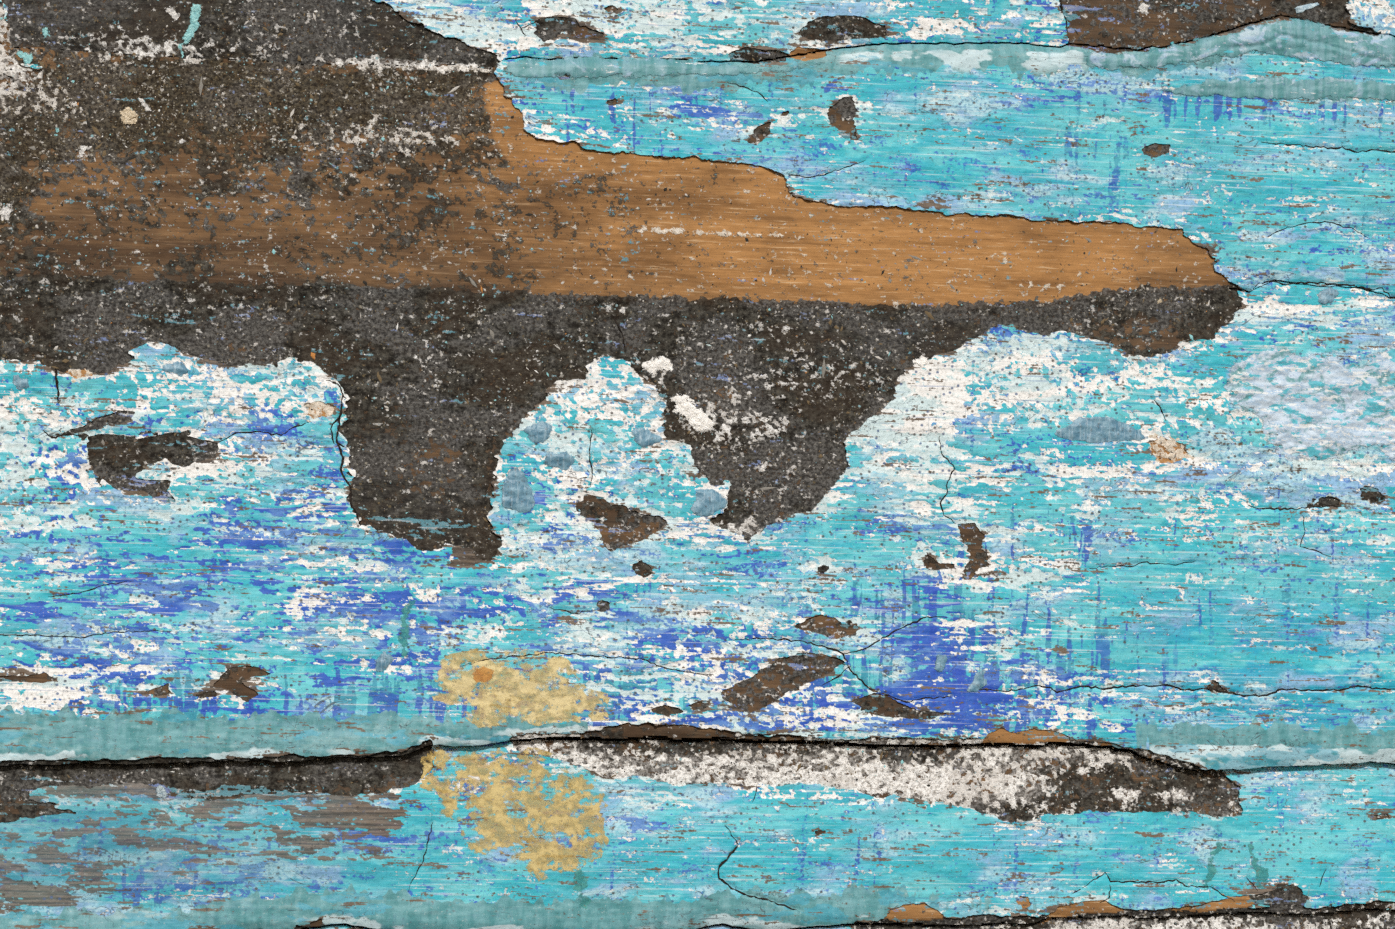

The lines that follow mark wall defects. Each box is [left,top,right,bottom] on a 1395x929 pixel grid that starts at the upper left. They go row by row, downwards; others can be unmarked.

peeling [1059,0,1380,54]
peeling [0,0,1242,561]
peeling [632,560,653,578]
peeling [924,523,989,580]
peeling [505,614,1242,823]
peeling [0,739,433,823]
crack [717,826,796,910]
peeling [849,884,1395,929]